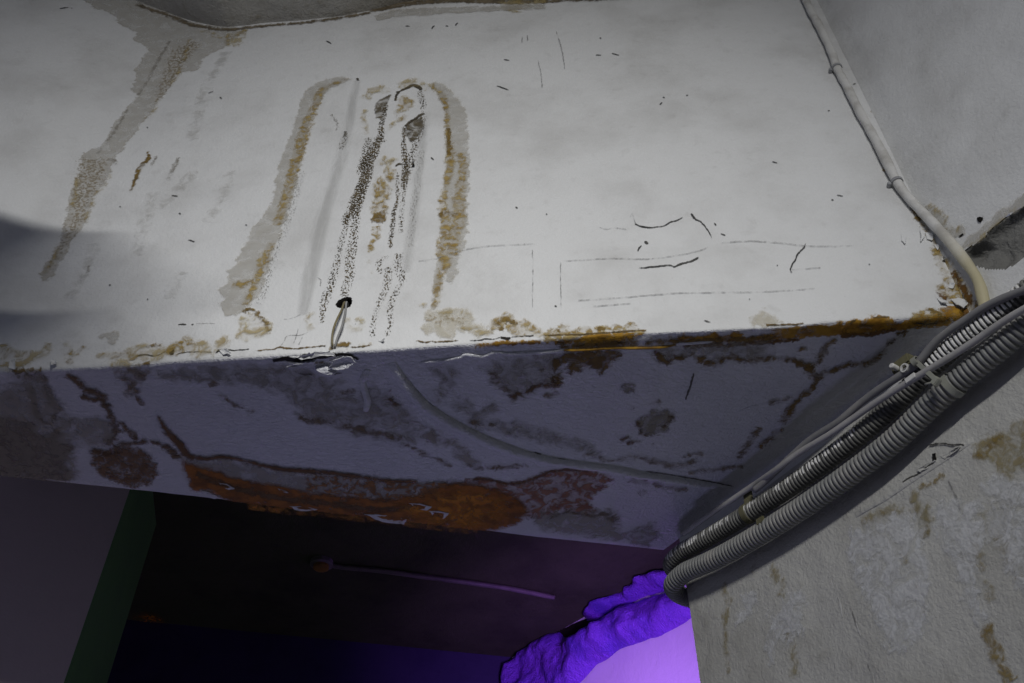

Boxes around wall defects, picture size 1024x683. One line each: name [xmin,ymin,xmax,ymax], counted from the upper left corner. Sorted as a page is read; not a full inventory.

rust [0,343,50,375]
water stain [220,77,359,336]
peeling [273,351,359,371]
water stain [41,0,598,280]
rust [64,346,612,531]
water stain [308,79,490,337]
water stain [620,400,674,445]
crack [597,213,820,292]
rust [475,210,978,458]